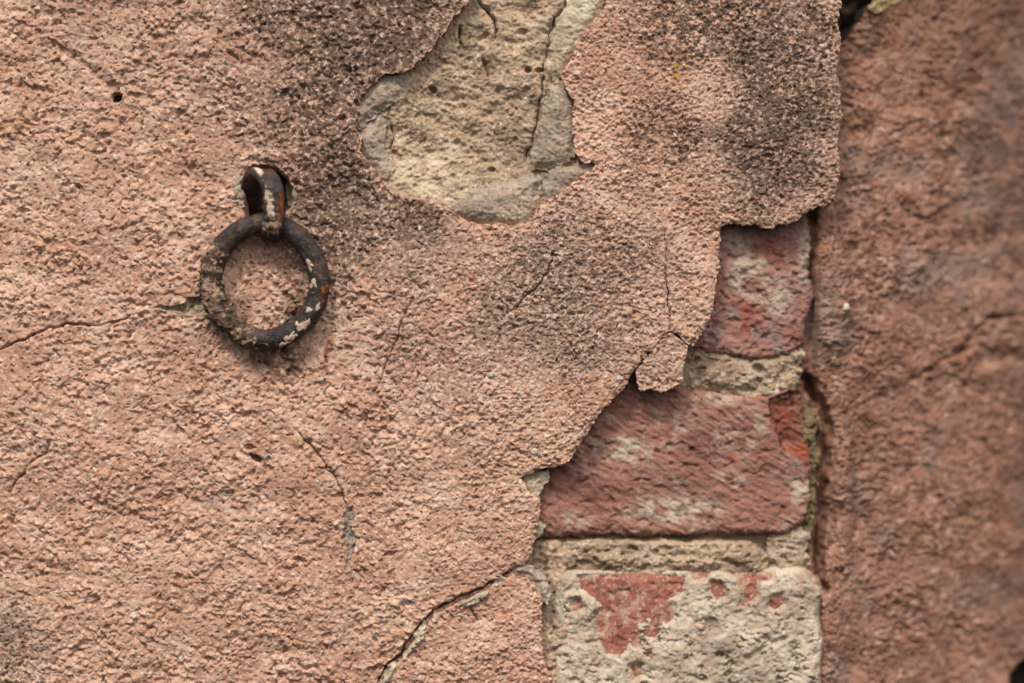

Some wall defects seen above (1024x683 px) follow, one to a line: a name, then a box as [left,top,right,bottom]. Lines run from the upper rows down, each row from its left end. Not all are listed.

spalling [355,0,606,226]
crack [0,315,131,350]
crack [300,434,348,506]
spalling [513,214,824,683]
crack [378,568,514,683]